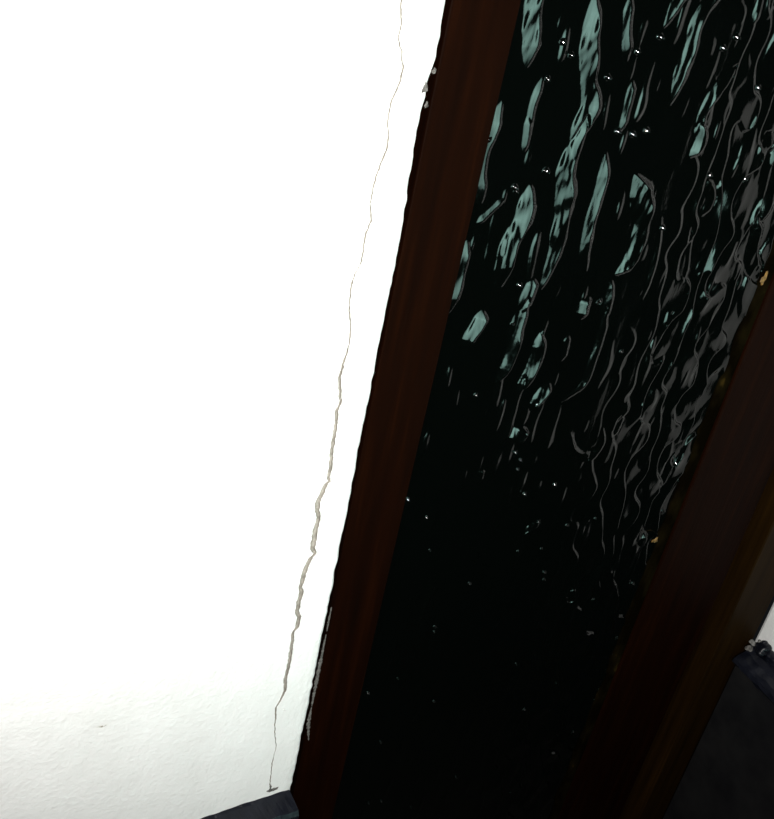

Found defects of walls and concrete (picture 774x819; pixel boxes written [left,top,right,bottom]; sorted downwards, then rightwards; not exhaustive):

crack [269,0,405,789]